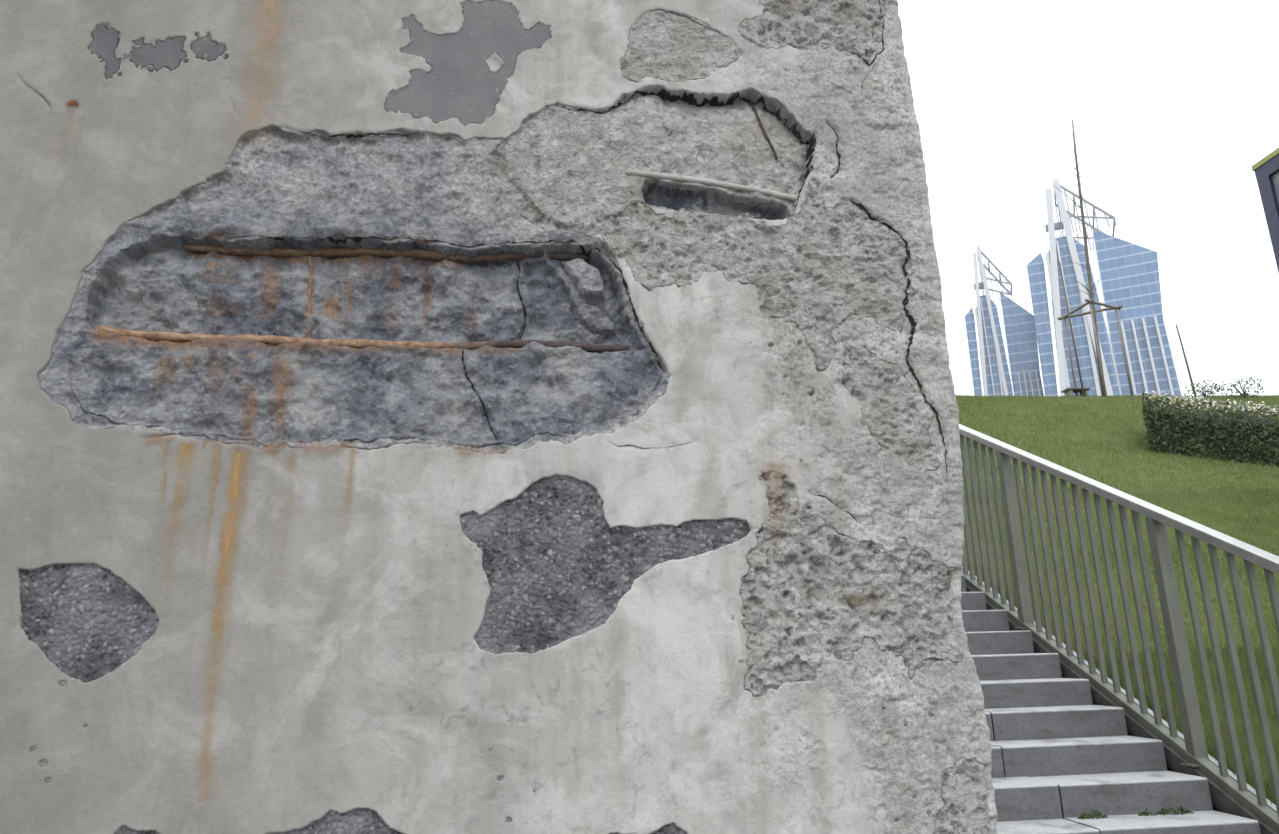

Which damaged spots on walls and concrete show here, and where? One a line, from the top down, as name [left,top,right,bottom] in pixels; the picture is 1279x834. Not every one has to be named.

spalling [38,0,940,477]
crack [794,125,841,211]
crack [851,201,947,481]
rust [219,451,243,586]
spalling [731,471,963,696]